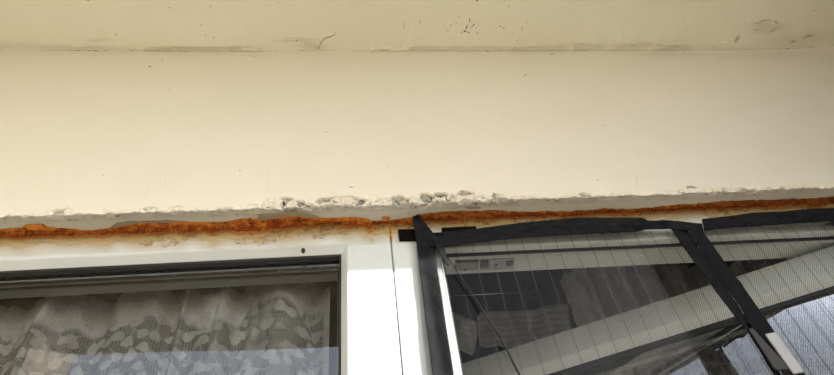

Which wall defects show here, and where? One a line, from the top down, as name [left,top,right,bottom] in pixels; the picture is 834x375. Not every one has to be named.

peeling [0,173,834,228]
corrosion [0,196,834,248]